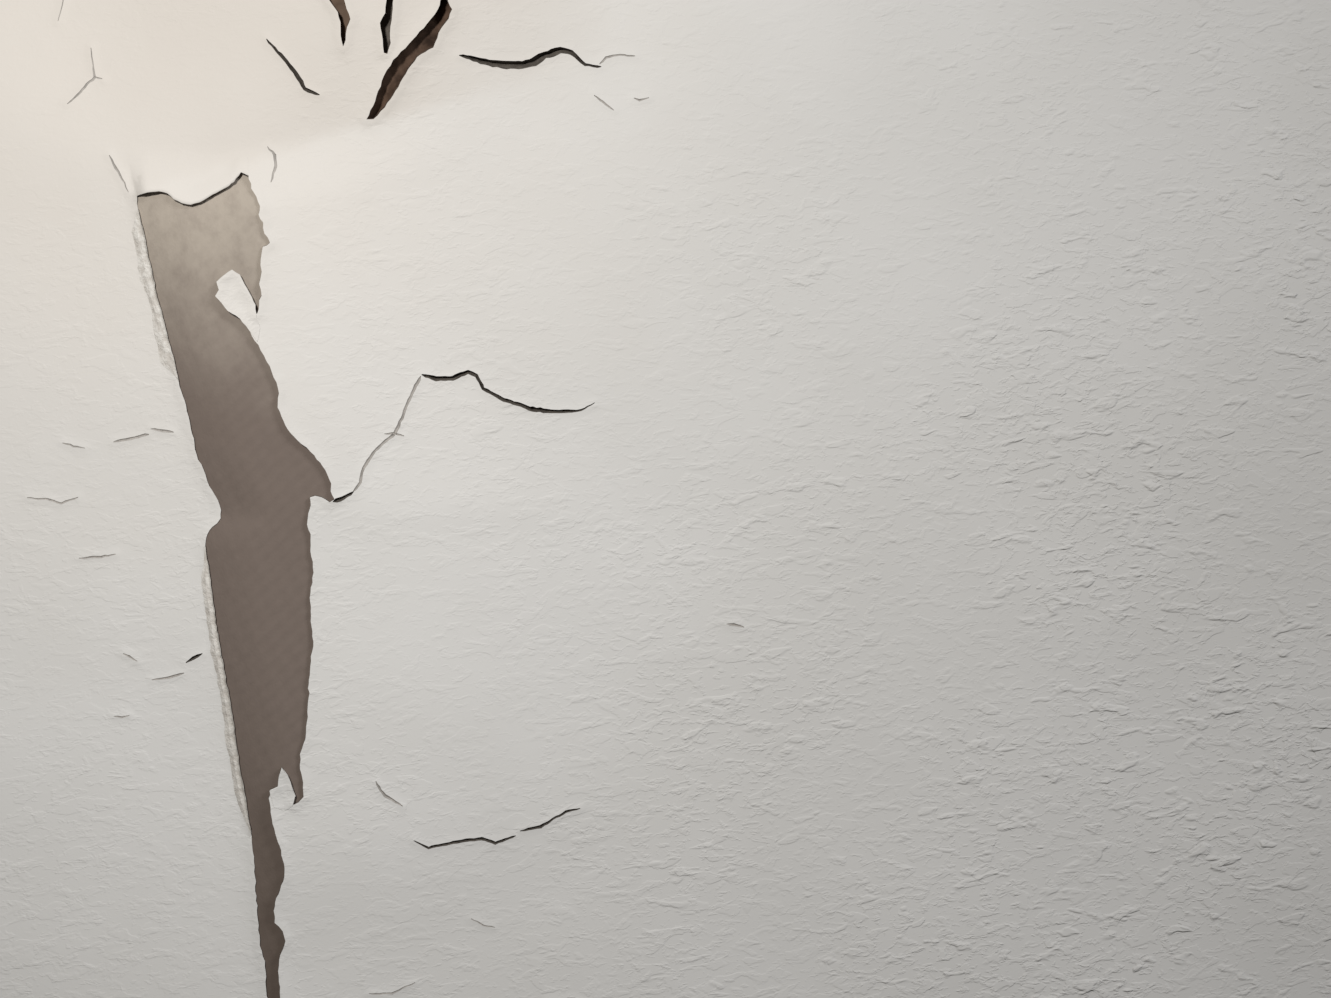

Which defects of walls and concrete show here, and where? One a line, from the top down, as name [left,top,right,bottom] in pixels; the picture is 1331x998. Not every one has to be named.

crack [329,0,649,119]
crack [333,370,595,502]
peeling [131,153,334,998]
crack [376,782,403,807]
crack [414,808,580,849]